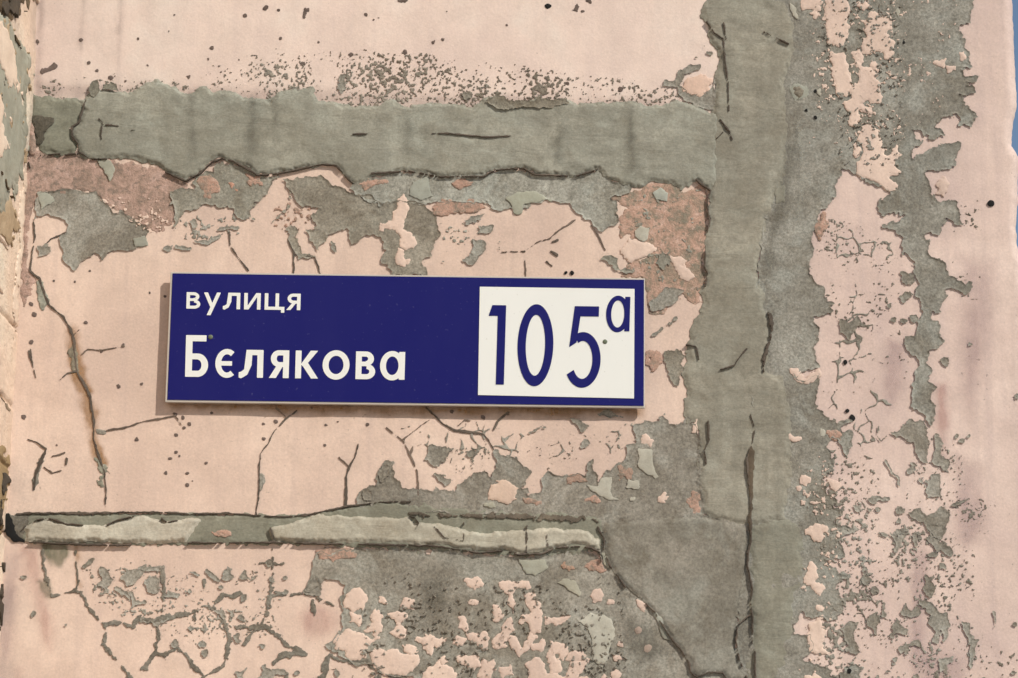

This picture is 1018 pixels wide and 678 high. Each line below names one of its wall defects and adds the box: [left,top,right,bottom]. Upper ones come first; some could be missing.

peeling [0,0,716,336]
crack [165,158,598,184]
crack [432,131,510,139]
peeling [663,349,685,386]
crack [686,312,774,372]
peeling [756,0,1018,678]
spalling [0,445,29,543]
crack [16,219,626,678]
peeling [303,408,761,678]
crack [645,414,756,678]
peeling [82,558,289,657]
peeling [258,664,300,678]